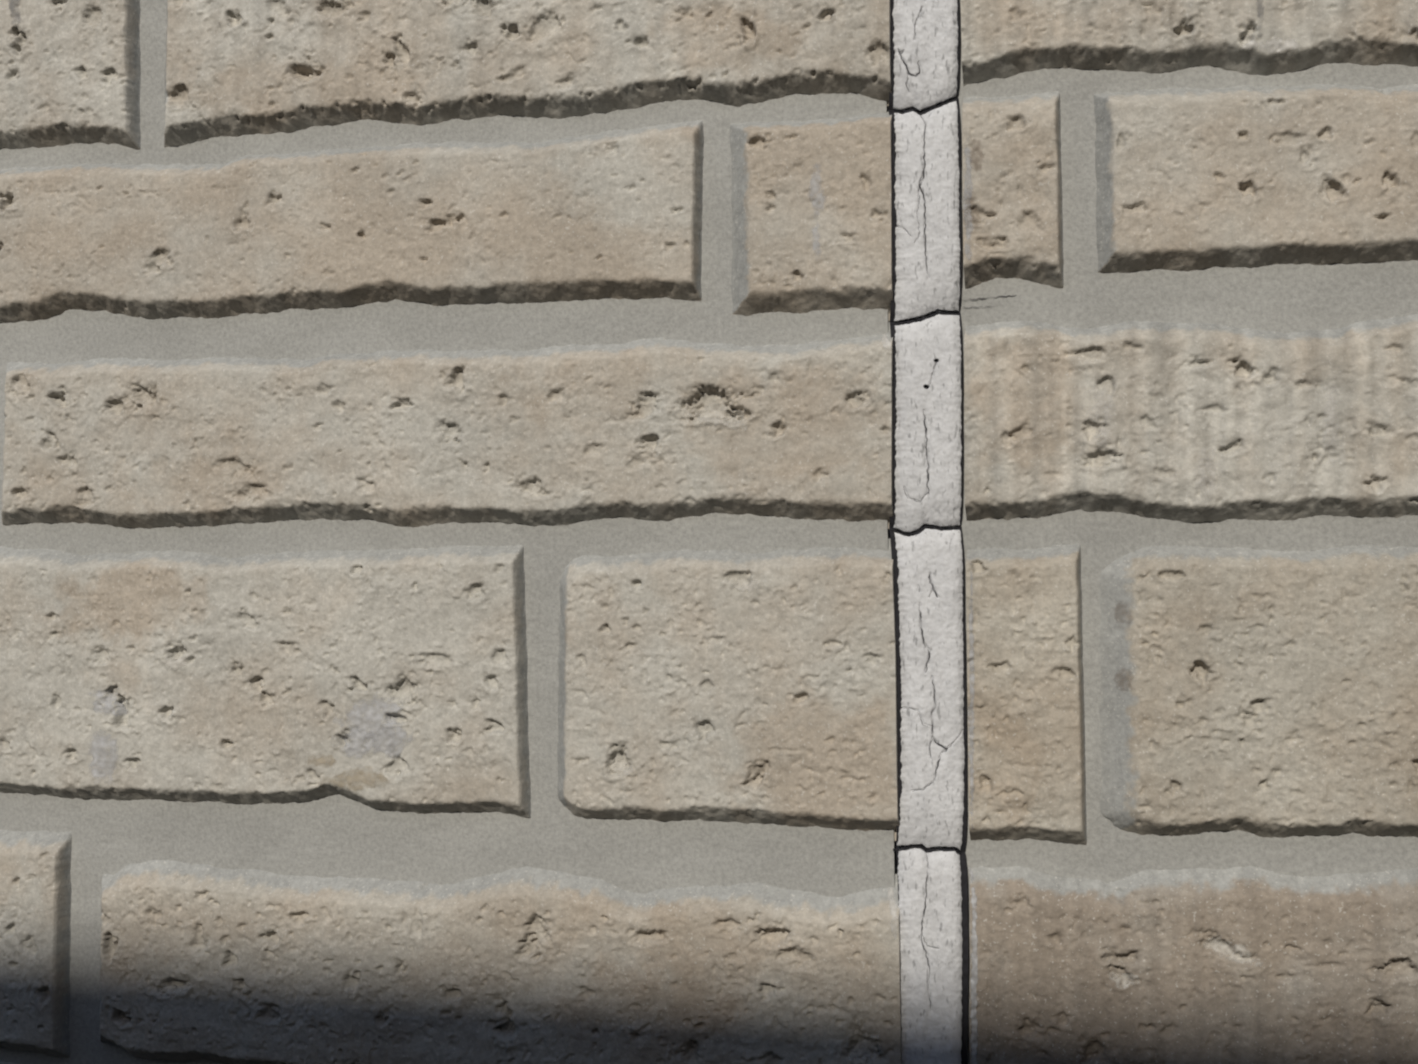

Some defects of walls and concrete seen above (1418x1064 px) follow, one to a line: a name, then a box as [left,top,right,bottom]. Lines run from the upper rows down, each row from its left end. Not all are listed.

crack [888,0,969,1064]